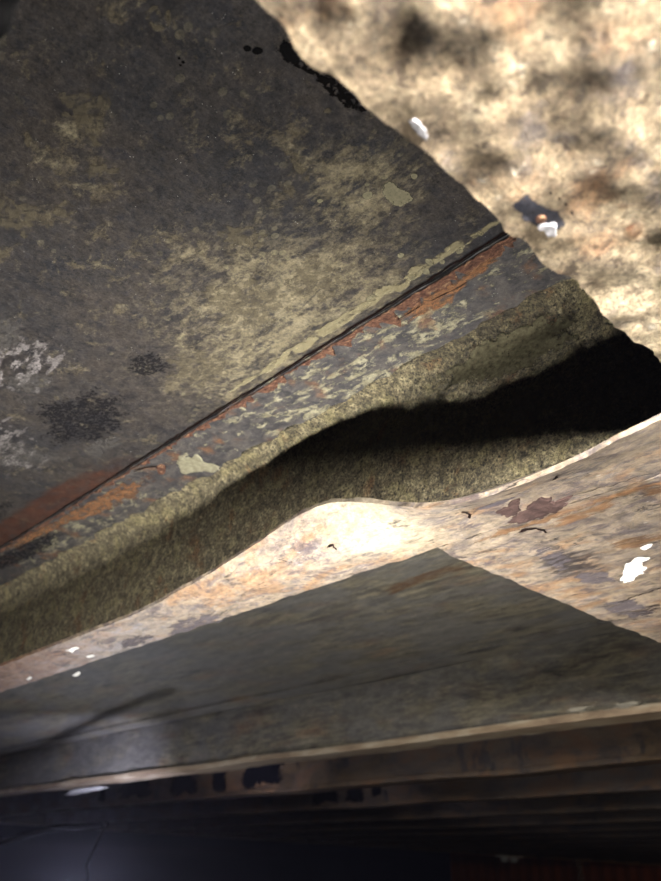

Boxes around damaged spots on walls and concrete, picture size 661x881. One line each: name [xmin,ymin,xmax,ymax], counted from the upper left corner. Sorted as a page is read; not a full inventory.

spalling [512,192,573,237]
corrosion [400,258,498,326]
peeling [177,454,220,474]
corrosion [6,464,166,550]
peeling [574,568,618,587]
peeling [603,598,660,620]
peeling [166,613,223,636]
peeling [121,635,153,649]